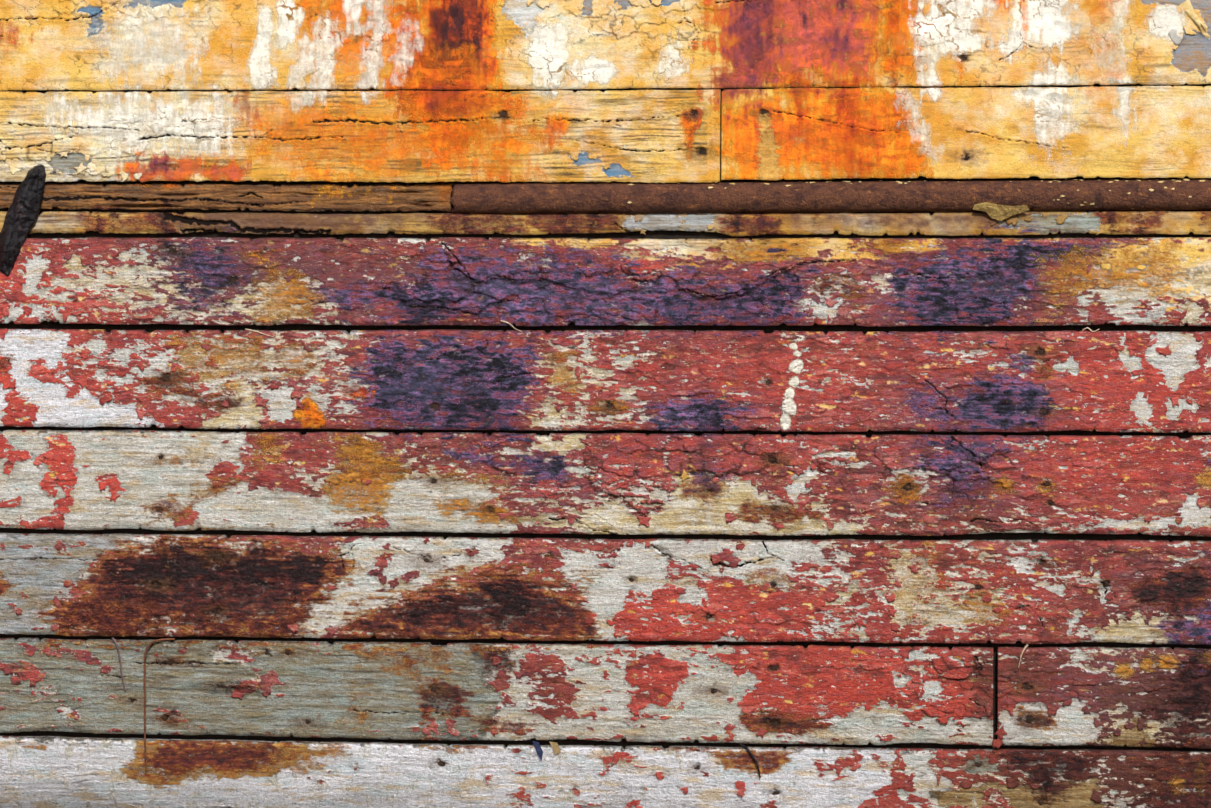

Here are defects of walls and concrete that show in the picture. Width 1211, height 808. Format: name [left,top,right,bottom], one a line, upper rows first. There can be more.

peeling [500,0,553,39]
peeling [611,0,680,12]
peeling [1141,0,1211,77]
rust [116,0,570,195]
crack [0,115,702,153]
rust [682,0,937,180]
crack [383,242,542,380]
crack [686,259,854,316]
peeling [0,252,1157,808]
rust [38,472,602,753]
peeling [1090,566,1172,658]
rust [119,710,349,789]